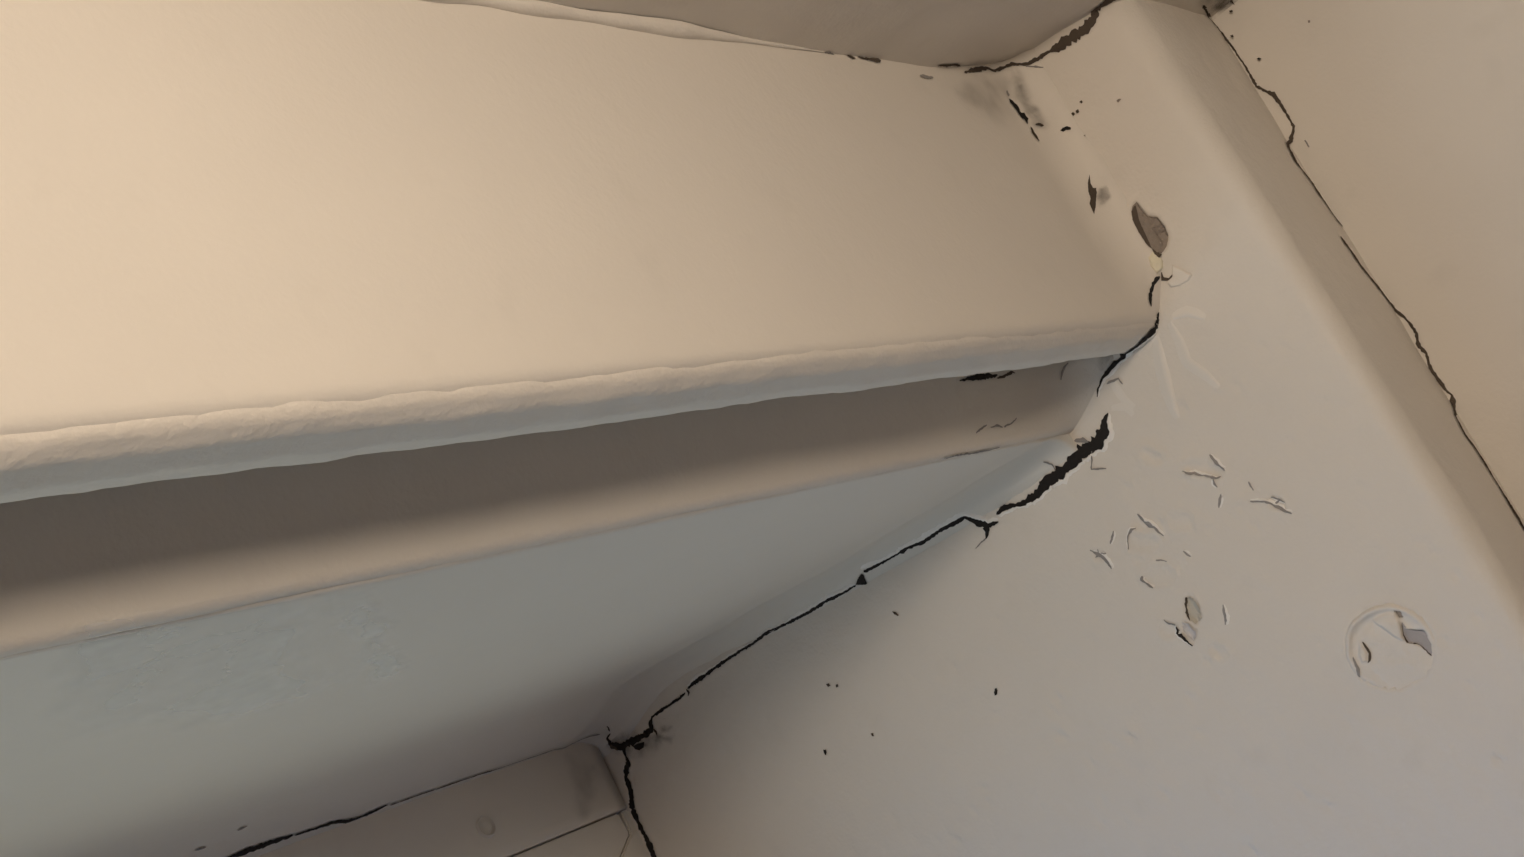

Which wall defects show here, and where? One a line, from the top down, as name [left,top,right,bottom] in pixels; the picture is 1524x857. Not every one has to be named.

crack [825,52,881,63]
crack [920,0,1116,79]
spalling [1131,202,1192,287]
crack [1203,5,1524,529]
crack [1183,454,1293,514]
crack [195,272,1172,857]
crack [1090,513,1193,646]
peeling [1182,597,1202,641]
crack [1222,605,1230,625]
crack [1353,642,1371,677]